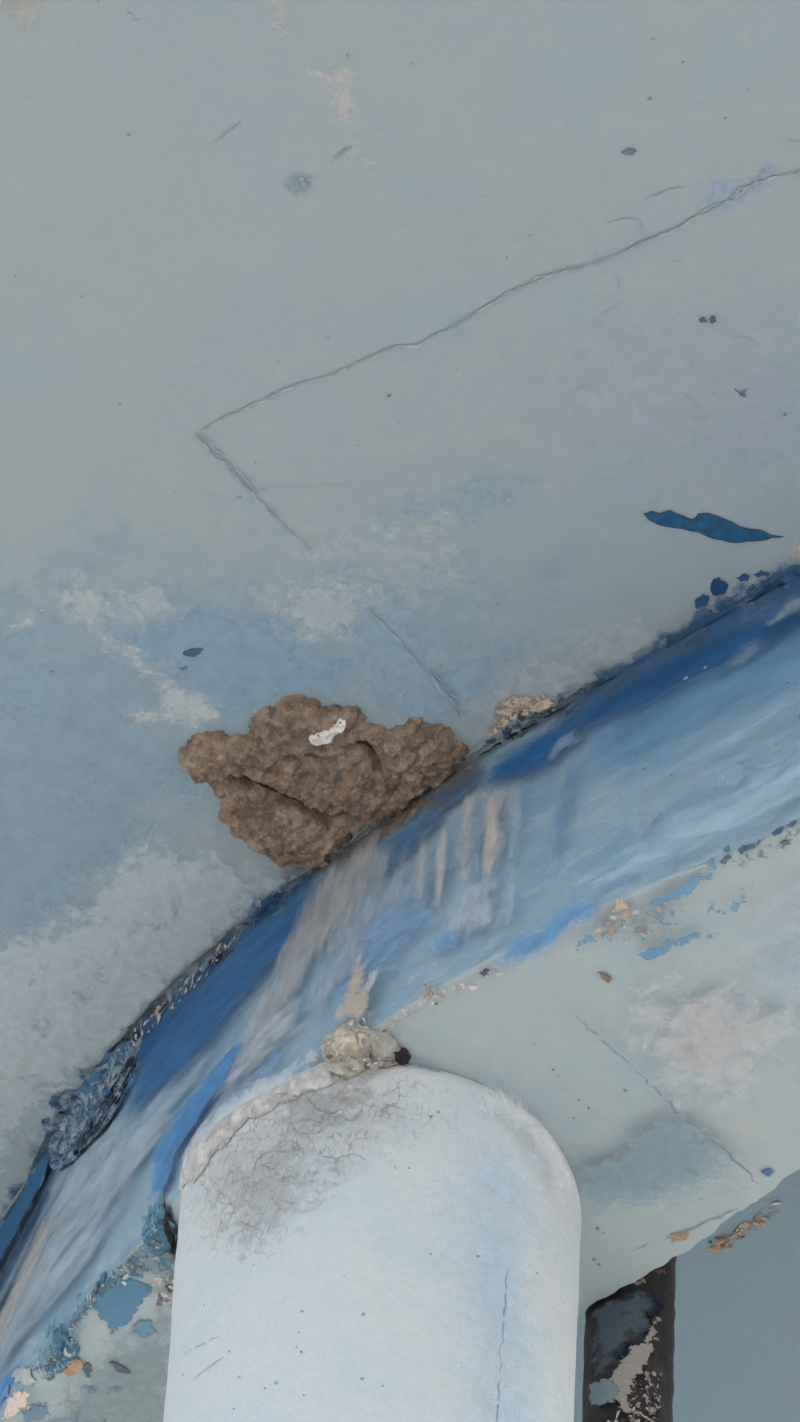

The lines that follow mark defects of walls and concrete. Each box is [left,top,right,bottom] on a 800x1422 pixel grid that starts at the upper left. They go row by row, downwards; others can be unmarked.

crack [195,433,352,557]
peeling [320,618,694,869]
crack [478,574,800,757]
peeling [695,565,800,623]
water stain [124,545,800,1196]
water stain [5,1149,52,1224]
peeling [0,836,296,1422]
crack [570,1012,774,1205]
spalling [667,1202,781,1254]
peeling [588,1268,666,1422]